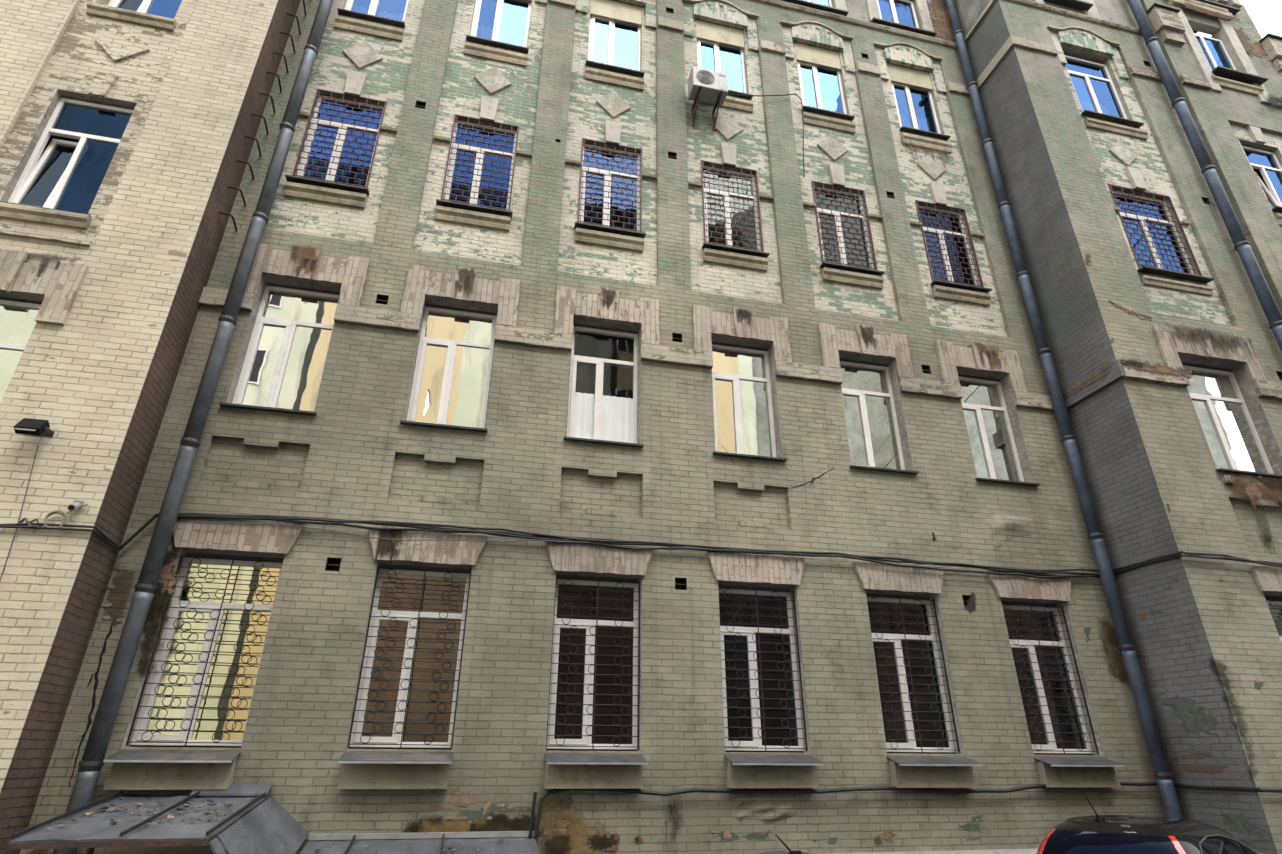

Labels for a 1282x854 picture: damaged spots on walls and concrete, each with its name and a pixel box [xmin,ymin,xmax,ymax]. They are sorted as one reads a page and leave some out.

crack [788,468,833,489]
damp [1100,621,1130,684]
damp [542,798,605,854]